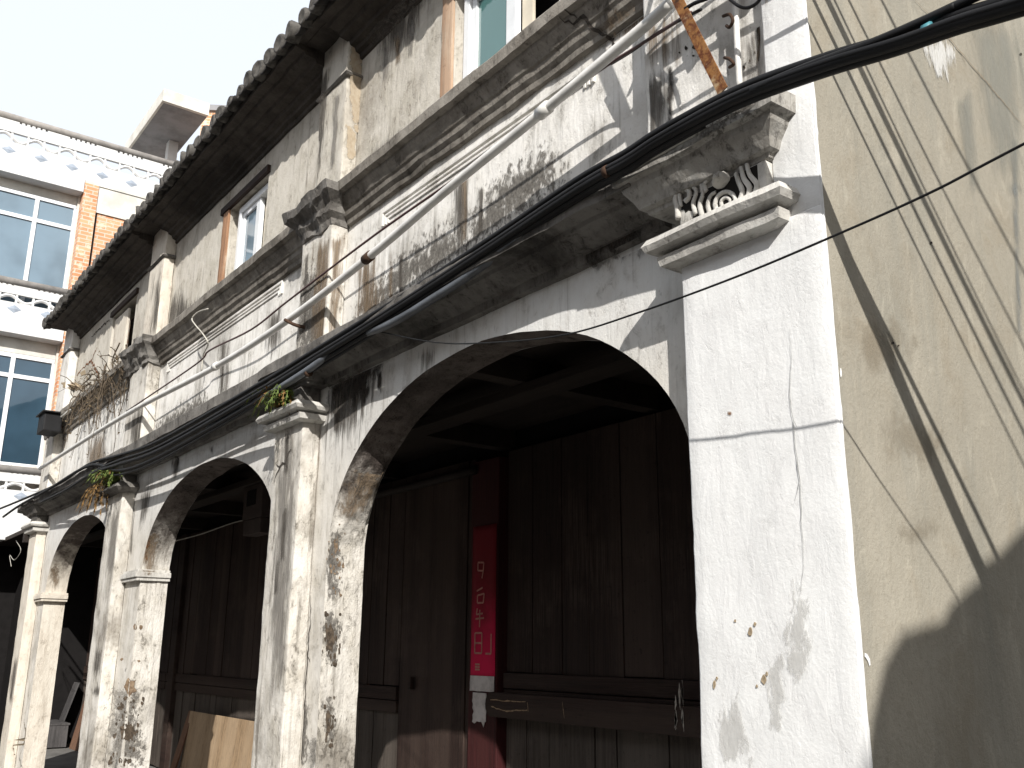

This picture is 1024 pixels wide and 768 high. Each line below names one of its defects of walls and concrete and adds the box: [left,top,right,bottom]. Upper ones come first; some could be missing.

water stain [354,144,569,318]
water stain [585,230,638,269]
water stain [320,360,381,438]
crack [789,344,804,595]
peeling [326,524,345,599]
spalling [322,611,342,667]
spalling [108,678,145,766]
spalling [306,696,336,764]